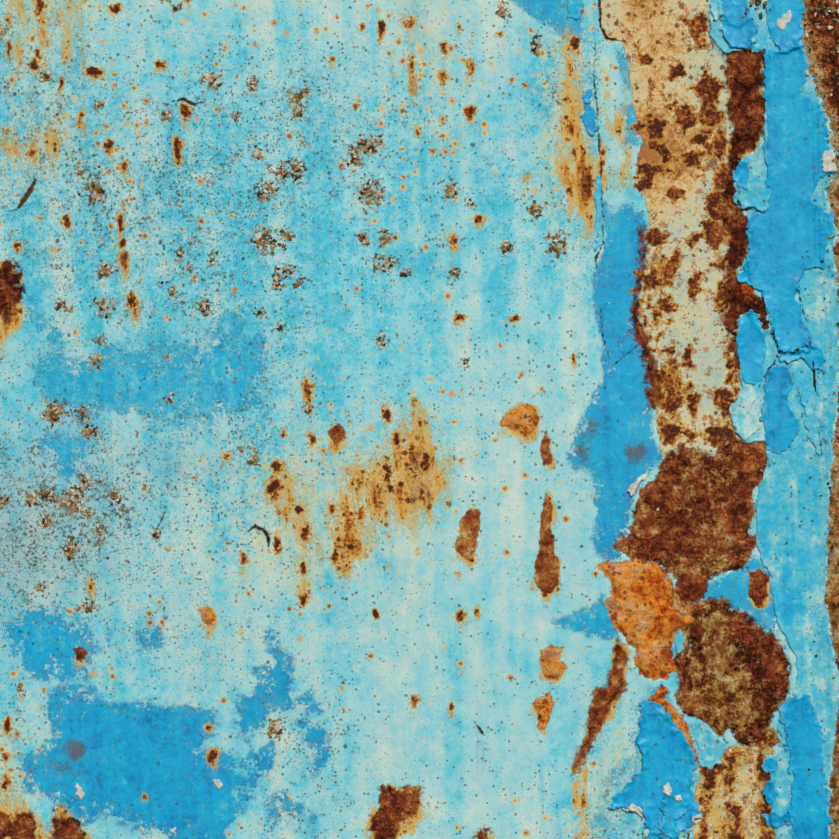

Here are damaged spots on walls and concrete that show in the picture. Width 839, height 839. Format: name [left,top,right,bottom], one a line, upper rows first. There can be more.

peeling [512,0,584,40]
corrosion [0,241,27,350]
crack [593,0,625,268]
corrosion [719,49,769,342]
corrosion [265,396,465,608]
corrosion [529,492,561,602]
peeling [552,595,617,639]
corrosion [592,437,791,763]
peeling [568,0,839,839]
corrosion [824,386,839,672]
corrosion [0,774,91,839]
corrosion [364,783,425,839]